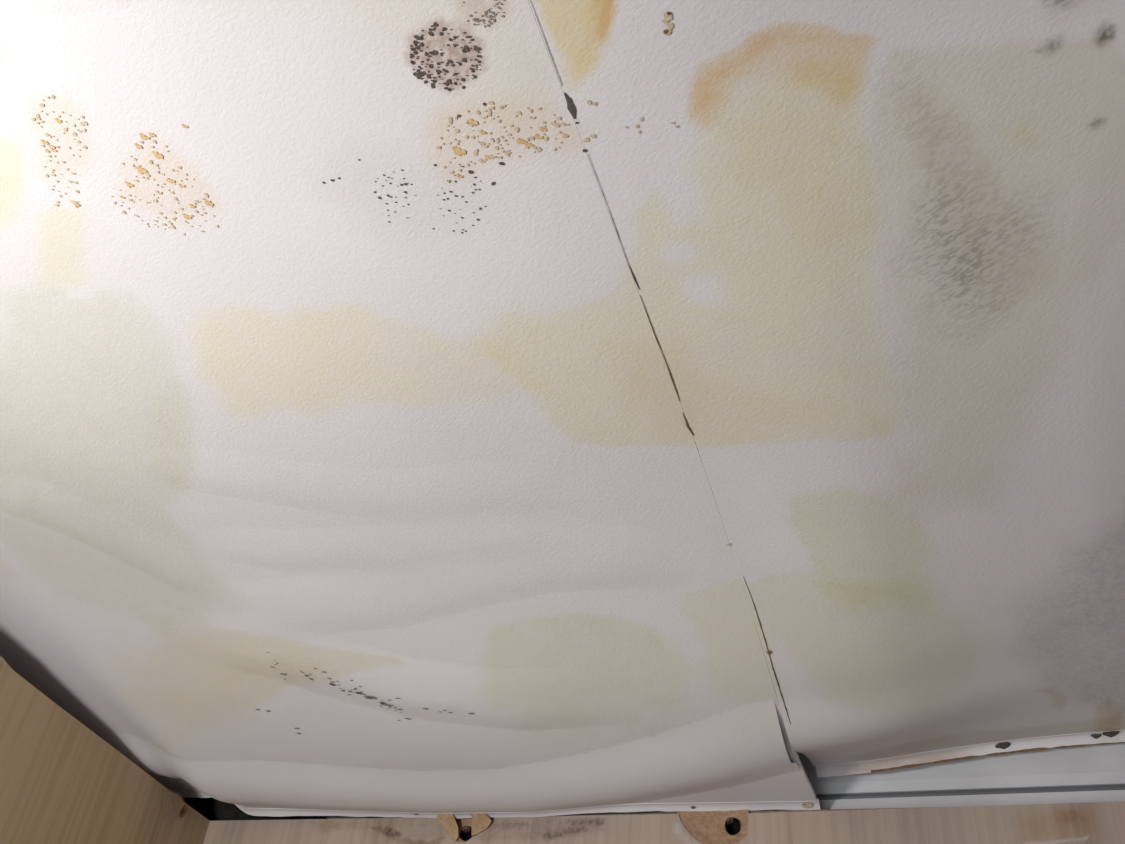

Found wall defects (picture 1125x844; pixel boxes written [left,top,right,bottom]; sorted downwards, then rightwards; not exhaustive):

water stain [410,0,505,91]
water stain [530,1,597,124]
corrosion [31,95,87,208]
corrosion [111,133,218,235]
corrosion [434,101,569,178]
water stain [583,134,640,290]
water stain [300,668,411,721]
peeling [815,730,1125,777]